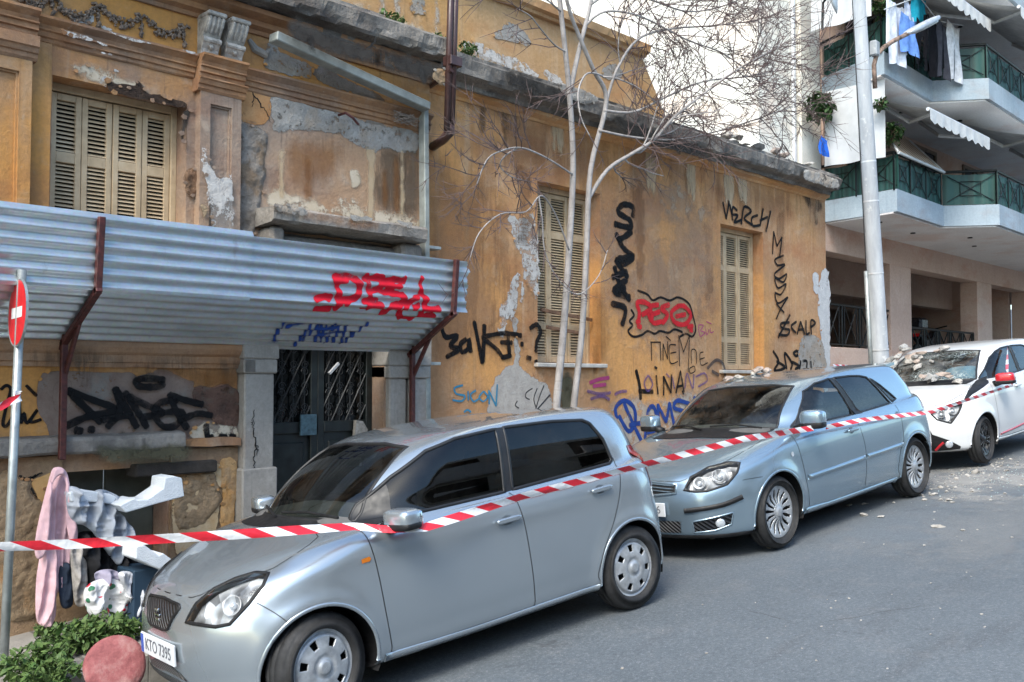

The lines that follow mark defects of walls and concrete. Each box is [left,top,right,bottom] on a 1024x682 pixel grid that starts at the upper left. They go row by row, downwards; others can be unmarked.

flaking render [73,64,173,105]
peeling [464,22,598,105]
flaking render [183,124,269,235]
peeling [497,213,541,347]
peeling [812,268,831,367]
flaking render [189,384,239,438]
crack [251,411,259,468]
flaking render [171,464,226,554]